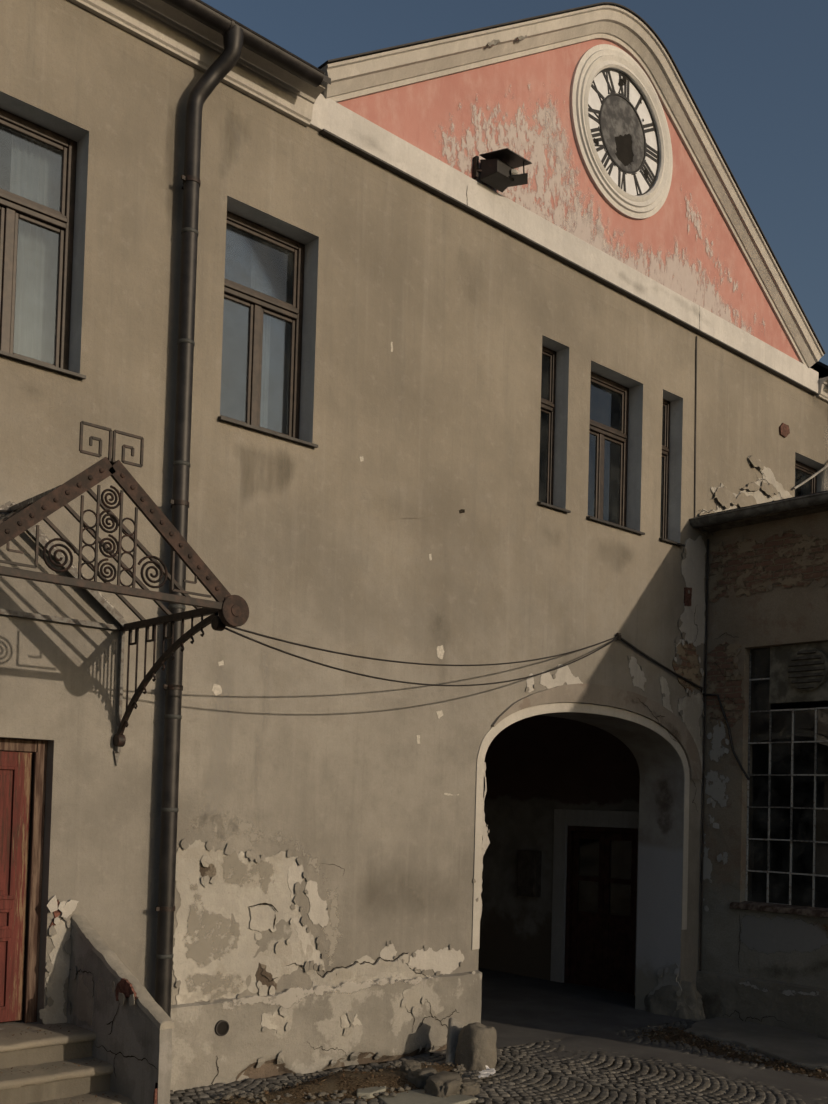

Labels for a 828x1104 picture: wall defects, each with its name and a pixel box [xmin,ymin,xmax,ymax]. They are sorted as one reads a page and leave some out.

peeling [439,98,765,334]
peeling [696,455,792,517]
peeling [525,664,583,693]
peeling [659,530,730,883]
peeling [172,838,464,1015]
spalling [39,895,79,1024]
flaking render [112,978,139,1006]
crack [94,1003,158,1076]
spalling [236,1051,296,1081]
peeling [261,1006,292,1034]
spalling [318,1043,447,1072]